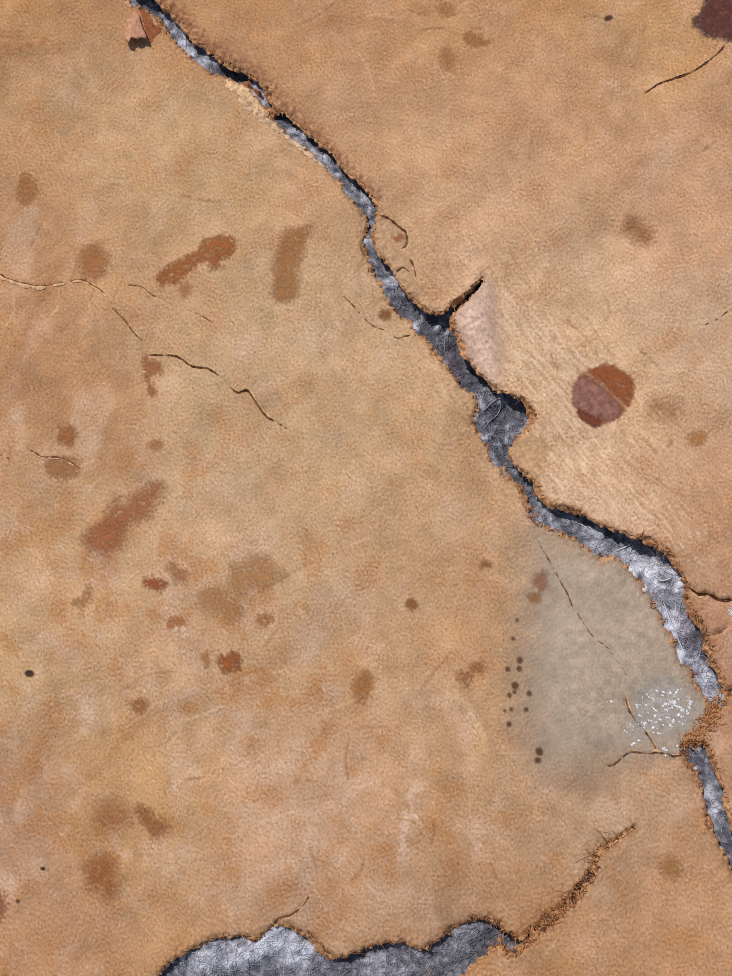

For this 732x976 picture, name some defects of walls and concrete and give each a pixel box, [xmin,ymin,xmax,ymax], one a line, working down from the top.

crack [645,40,729,93]
rust [157,235,235,284]
crack [380,215,416,277]
crack [343,296,415,339]
crack [0,274,287,429]
crack [688,586,732,602]
crack [529,509,682,767]
damp [504,657,531,726]
crack [274,896,309,923]